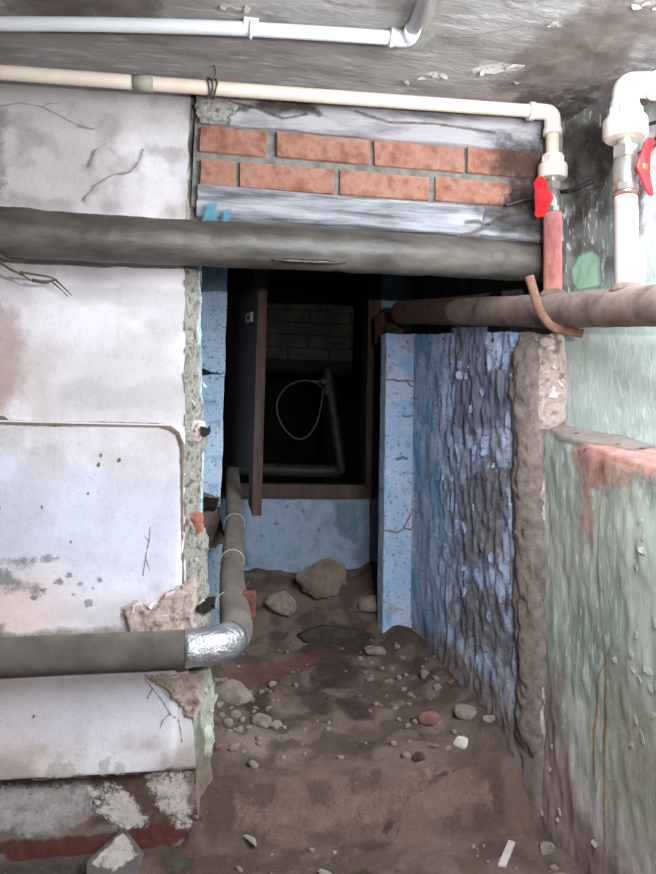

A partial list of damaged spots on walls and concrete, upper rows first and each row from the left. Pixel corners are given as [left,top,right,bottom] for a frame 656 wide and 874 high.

damp [15,0,150,17]
damp [508,0,656,90]
crack [0,102,94,130]
crack [227,100,308,127]
crack [355,110,495,133]
spalling [441,325,655,758]
damp [0,569,46,599]
damp [0,771,190,838]